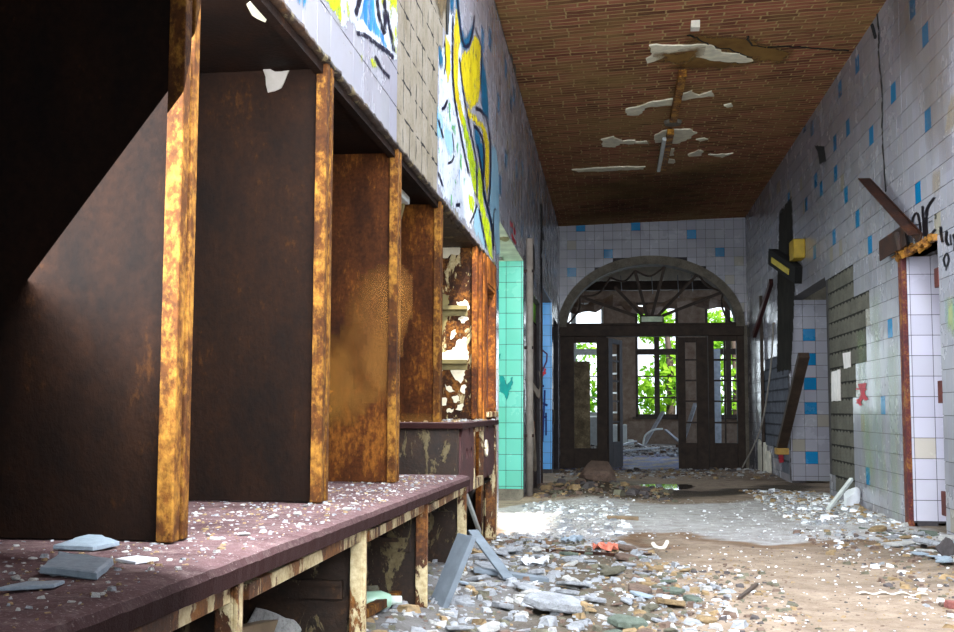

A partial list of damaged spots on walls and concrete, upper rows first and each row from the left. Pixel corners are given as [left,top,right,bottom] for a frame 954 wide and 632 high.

peeling [646,43,753,63]
spalling [396,0,447,192]
peeling [625,90,714,116]
peeling [601,128,733,164]
peeling [443,247,460,258]
peeling [442,294,470,413]